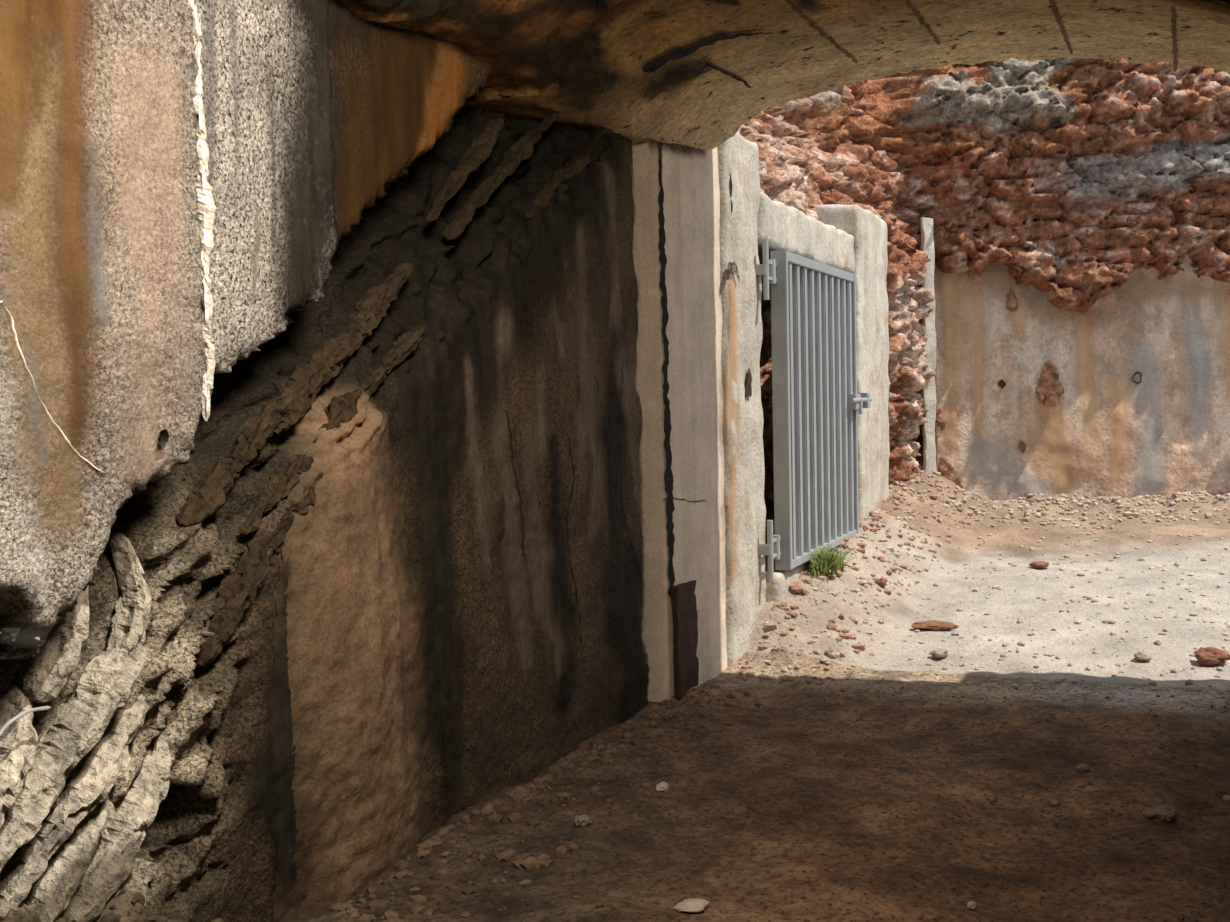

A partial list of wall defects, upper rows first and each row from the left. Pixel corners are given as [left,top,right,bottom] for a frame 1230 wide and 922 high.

crack [785,0,858,63]
crack [904,0,940,44]
crack [1049,0,1073,54]
crack [1170,6,1178,72]
corrosion [0,0,91,525]
spalling [188,0,216,421]
spalling [425,111,560,241]
crack [0,301,106,474]
spalling [176,263,426,667]
spalling [0,533,171,922]